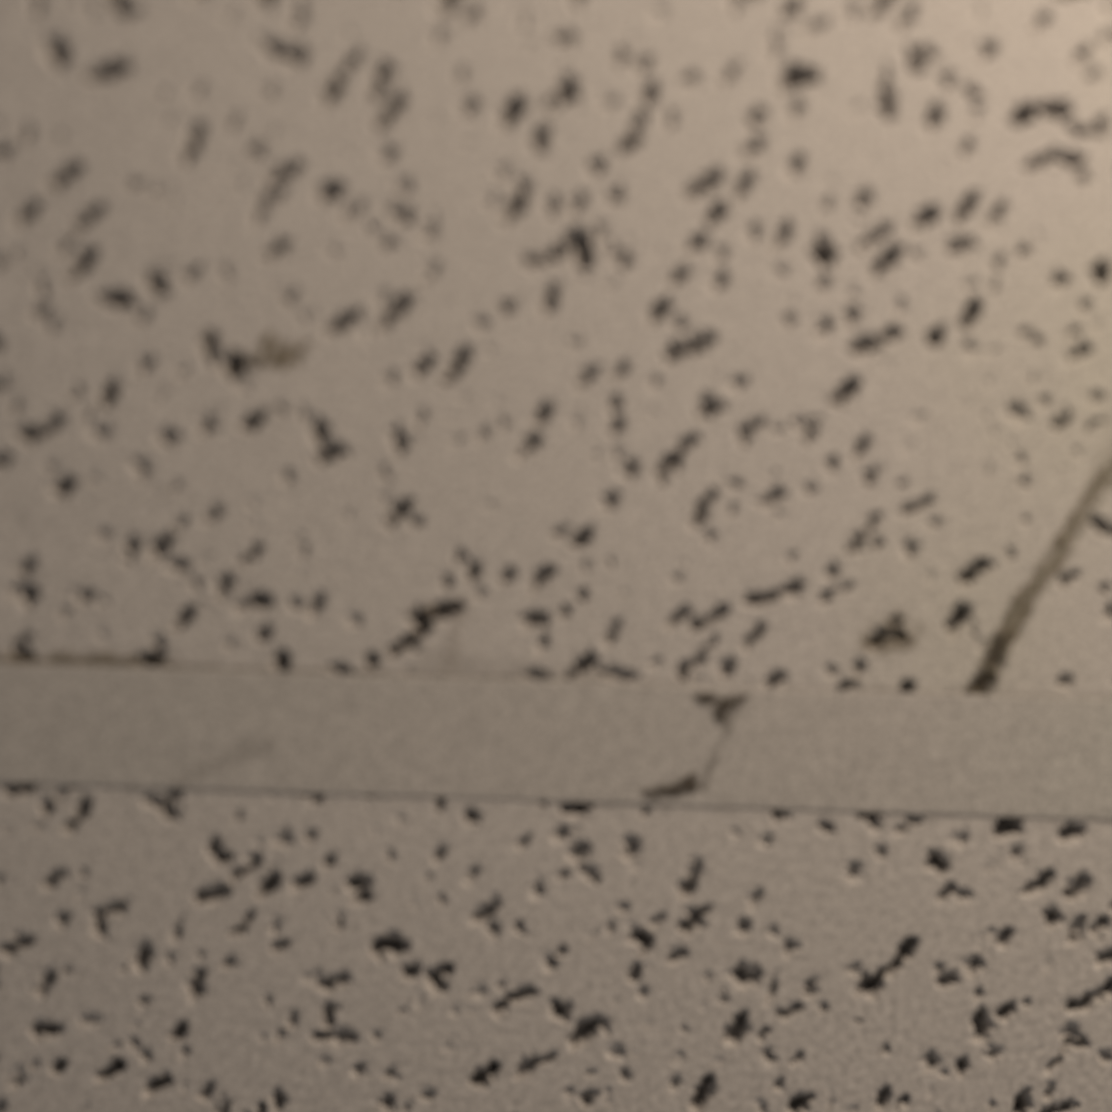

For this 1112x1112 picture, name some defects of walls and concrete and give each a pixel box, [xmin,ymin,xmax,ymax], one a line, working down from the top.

crack [965,512,1078,695]